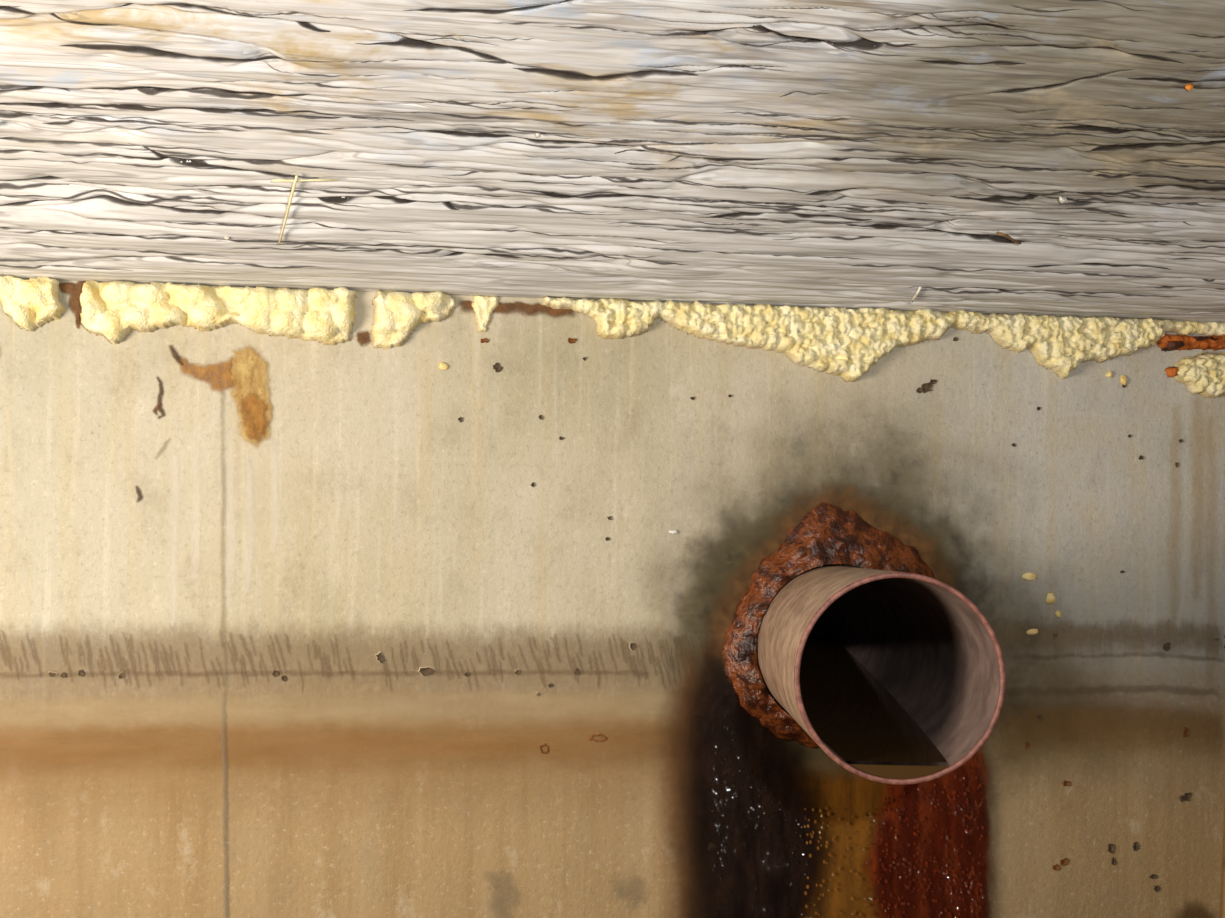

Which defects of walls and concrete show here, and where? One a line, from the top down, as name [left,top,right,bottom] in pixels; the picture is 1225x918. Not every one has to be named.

water stain [59,281,86,328]
water stain [493,302,573,317]
water stain [357,332,371,345]
corrosion [1165,367,1179,377]
corrosion [709,493,949,749]
water stain [0,459,968,918]
corrosion [804,750,989,918]